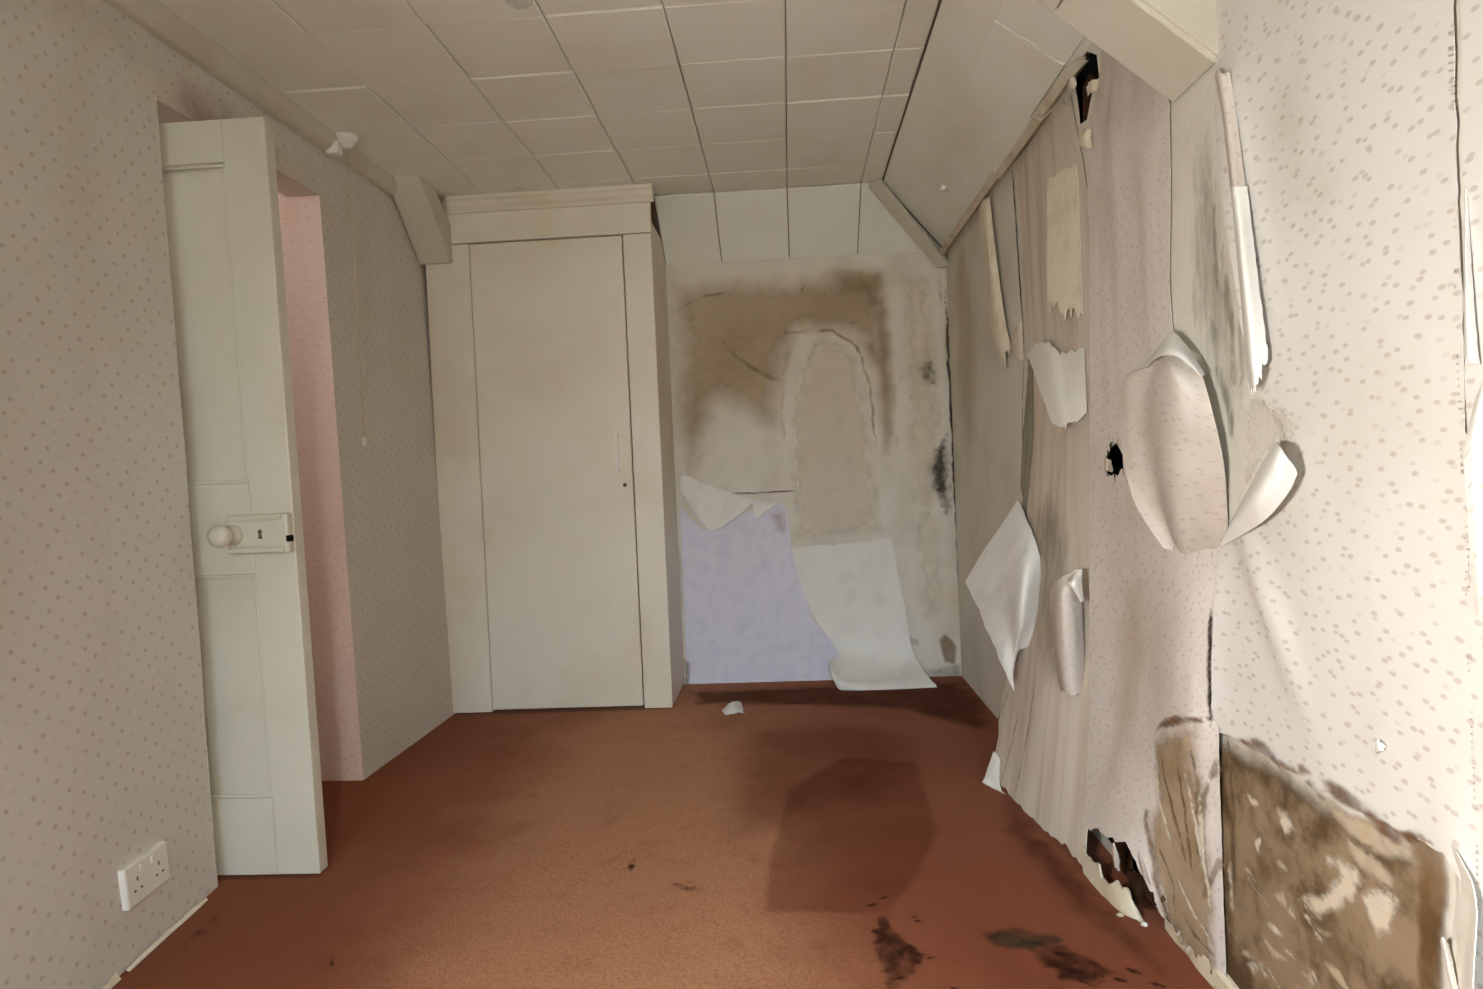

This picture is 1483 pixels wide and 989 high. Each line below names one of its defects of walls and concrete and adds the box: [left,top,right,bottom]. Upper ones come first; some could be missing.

spalling [1067,53,1099,149]
leakage [933,442,949,513]
flaking render [1021,359,1034,517]
spalling [1080,837,1166,927]